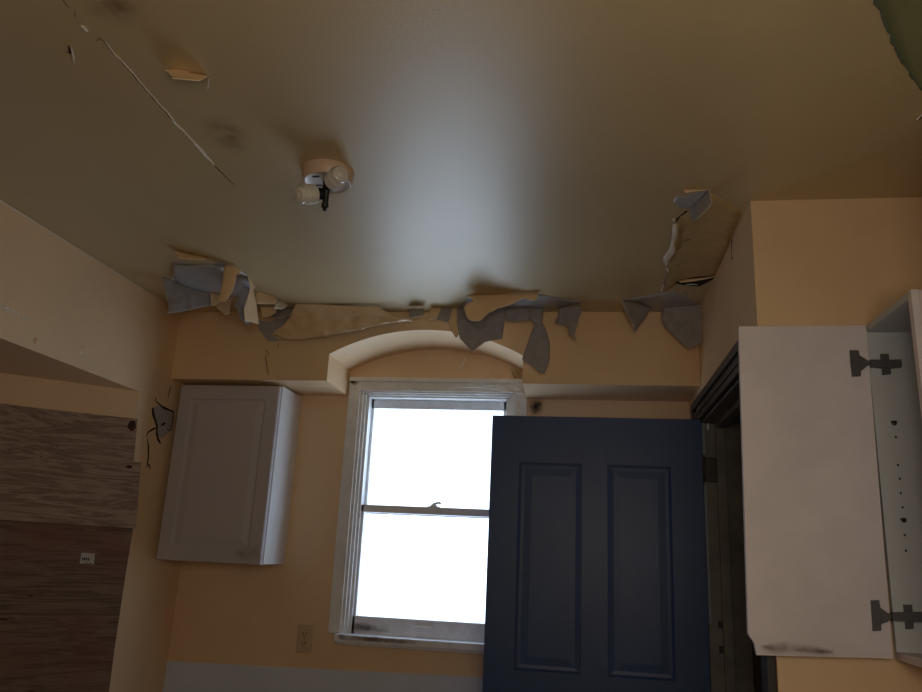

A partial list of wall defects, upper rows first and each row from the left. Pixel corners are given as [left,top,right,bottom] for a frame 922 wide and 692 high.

crack [63,0,234,185]
peeling [163,68,209,89]
peeling [161,250,290,342]
peeling [409,293,587,374]
peeling [622,290,703,348]